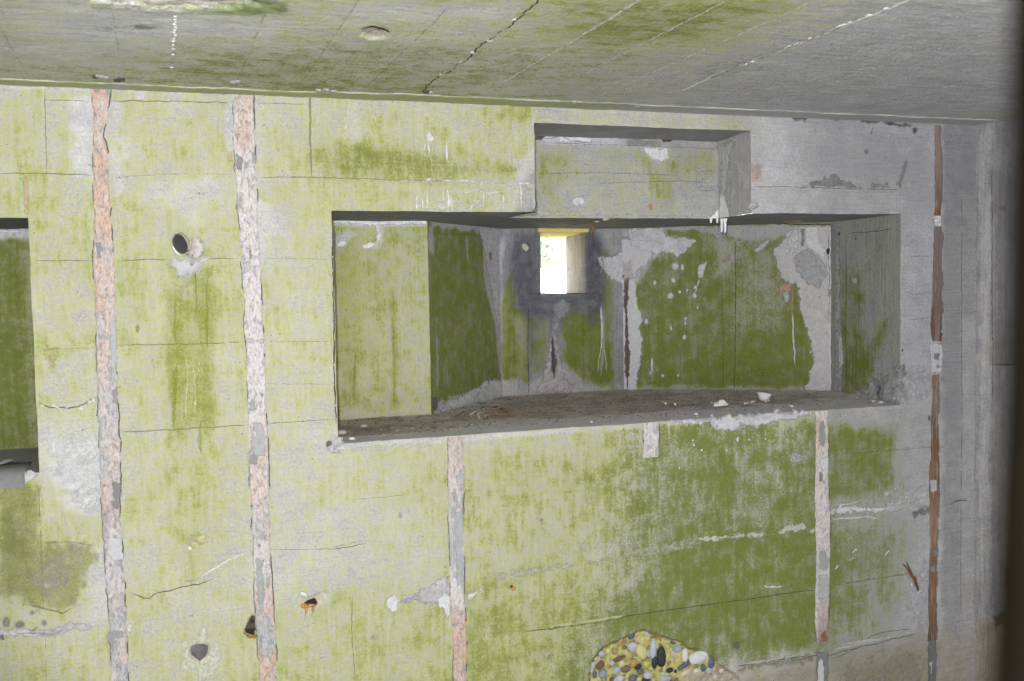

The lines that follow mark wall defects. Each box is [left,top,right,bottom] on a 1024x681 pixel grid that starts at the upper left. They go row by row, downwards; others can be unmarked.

crack [422,0,539,93]
leakage [415,129,530,210]
spalling [186,237,204,258]
leakage [598,306,612,371]
peeling [754,225,857,391]
leakage [830,484,930,520]
leakage [0,489,92,640]
crack [131,552,247,599]
leakage [594,522,815,564]
crack [609,590,814,620]